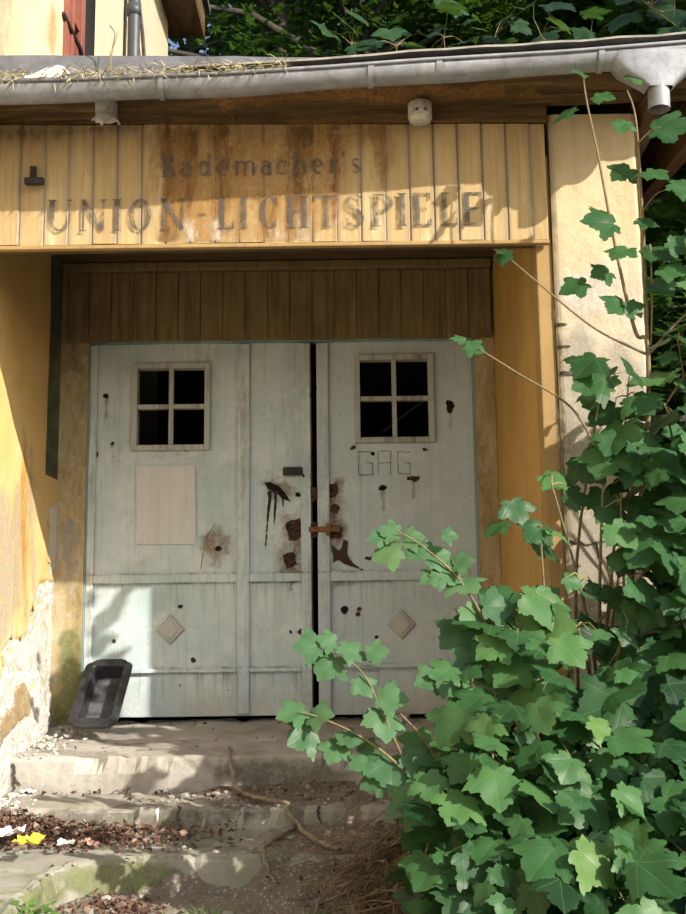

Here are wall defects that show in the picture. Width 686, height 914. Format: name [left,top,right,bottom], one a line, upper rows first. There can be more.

corrosion [281,519,318,573]
corrosion [310,486,318,502]
corrosion [329,480,344,547]
flaking render [0,504,125,797]